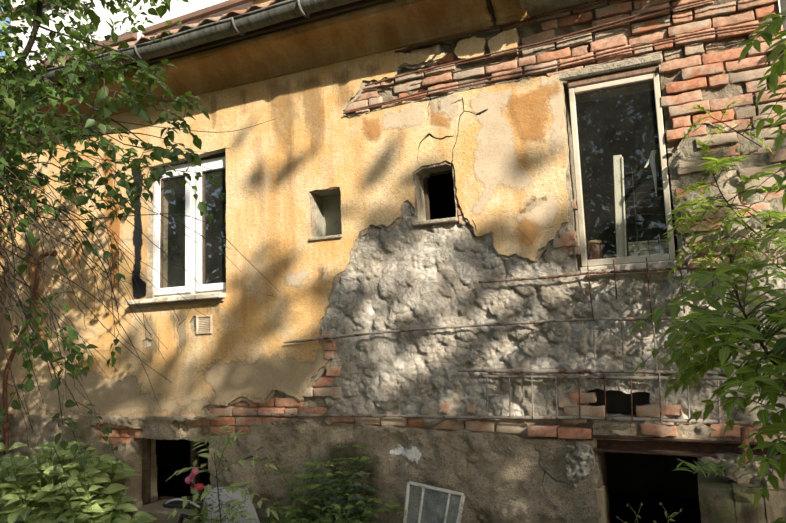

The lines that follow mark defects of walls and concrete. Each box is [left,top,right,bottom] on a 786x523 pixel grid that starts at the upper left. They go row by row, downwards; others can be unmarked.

crack [486,0,496,22]
crack [419,97,487,166]
spalling [183,0,786,439]
peeling [14,365,211,417]
spalling [96,423,150,446]